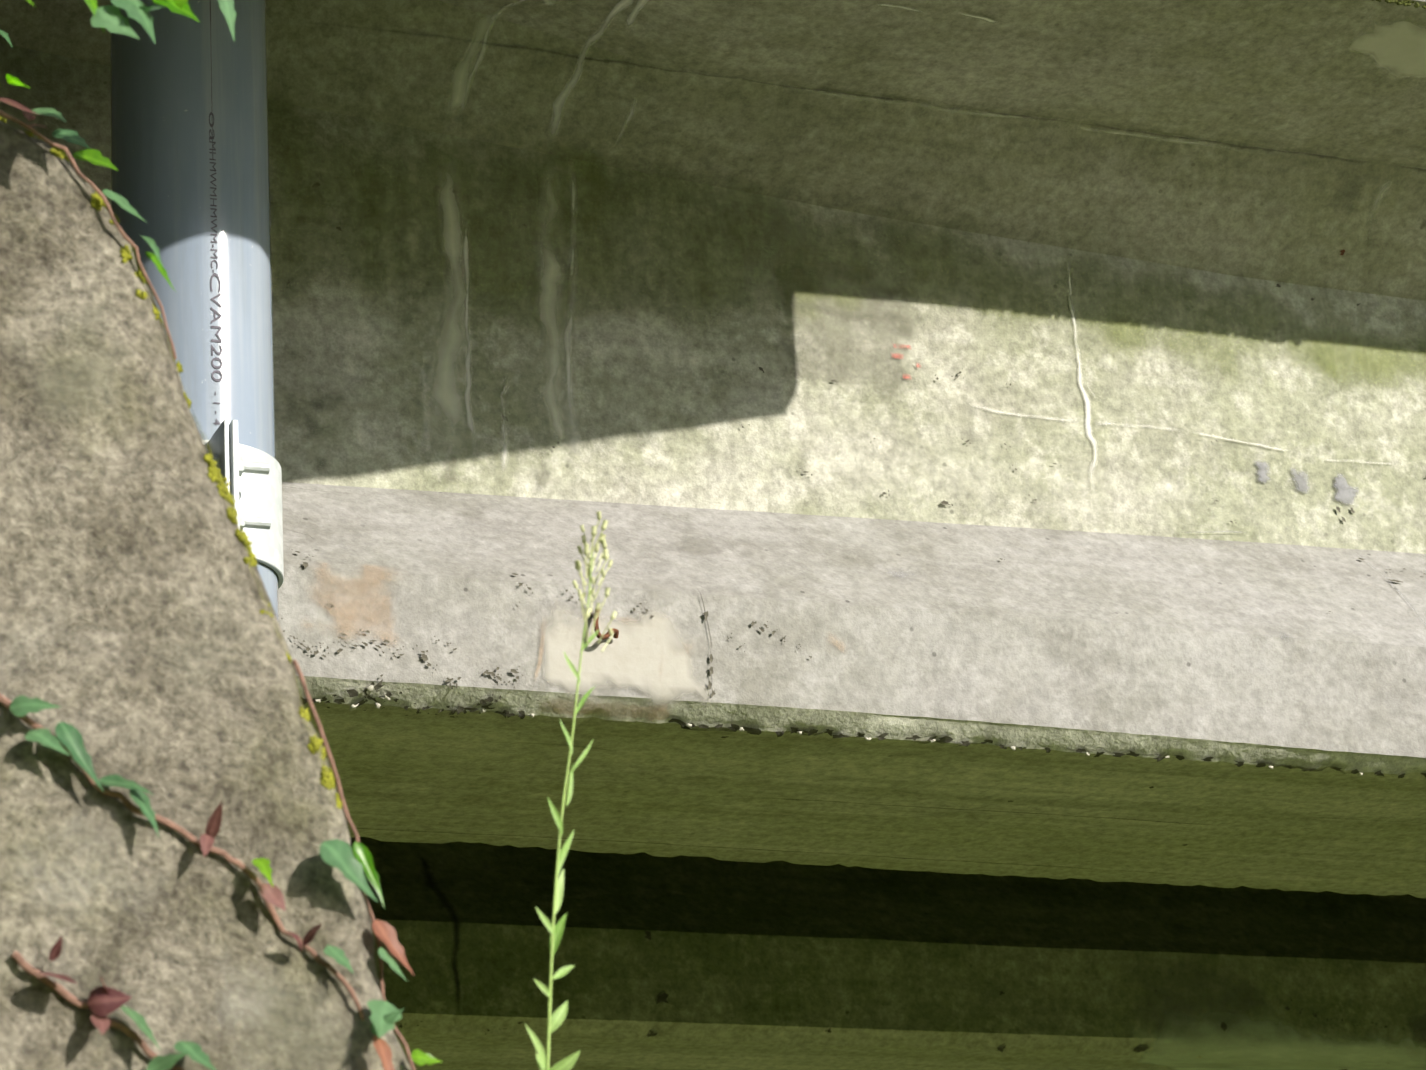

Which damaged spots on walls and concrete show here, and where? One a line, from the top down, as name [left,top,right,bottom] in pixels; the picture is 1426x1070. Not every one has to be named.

efflorescence [451,17,494,108]
efflorescence [554,0,648,128]
efflorescence [435,183,472,429]
efflorescence [542,251,571,430]
crack [1069,281,1096,468]
crack [422,859,460,998]